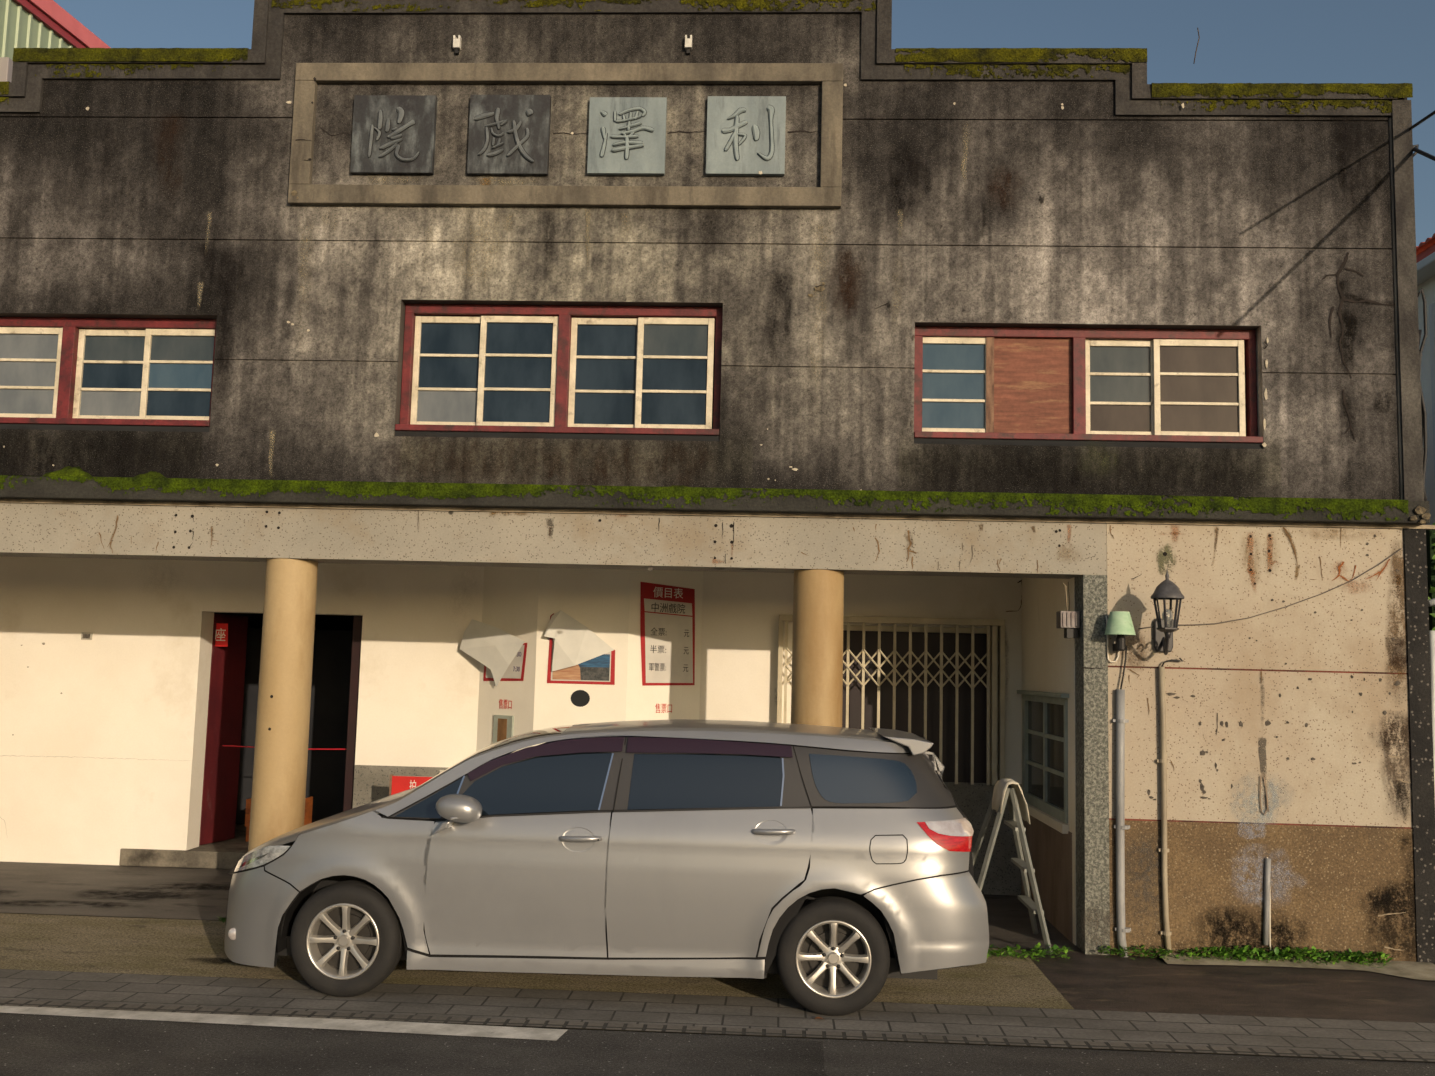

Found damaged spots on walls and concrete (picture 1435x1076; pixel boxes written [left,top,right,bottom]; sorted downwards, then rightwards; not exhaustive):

damp [1381,717,1411,811]
damp [1210,913,1293,953]
damp [1370,839,1416,958]